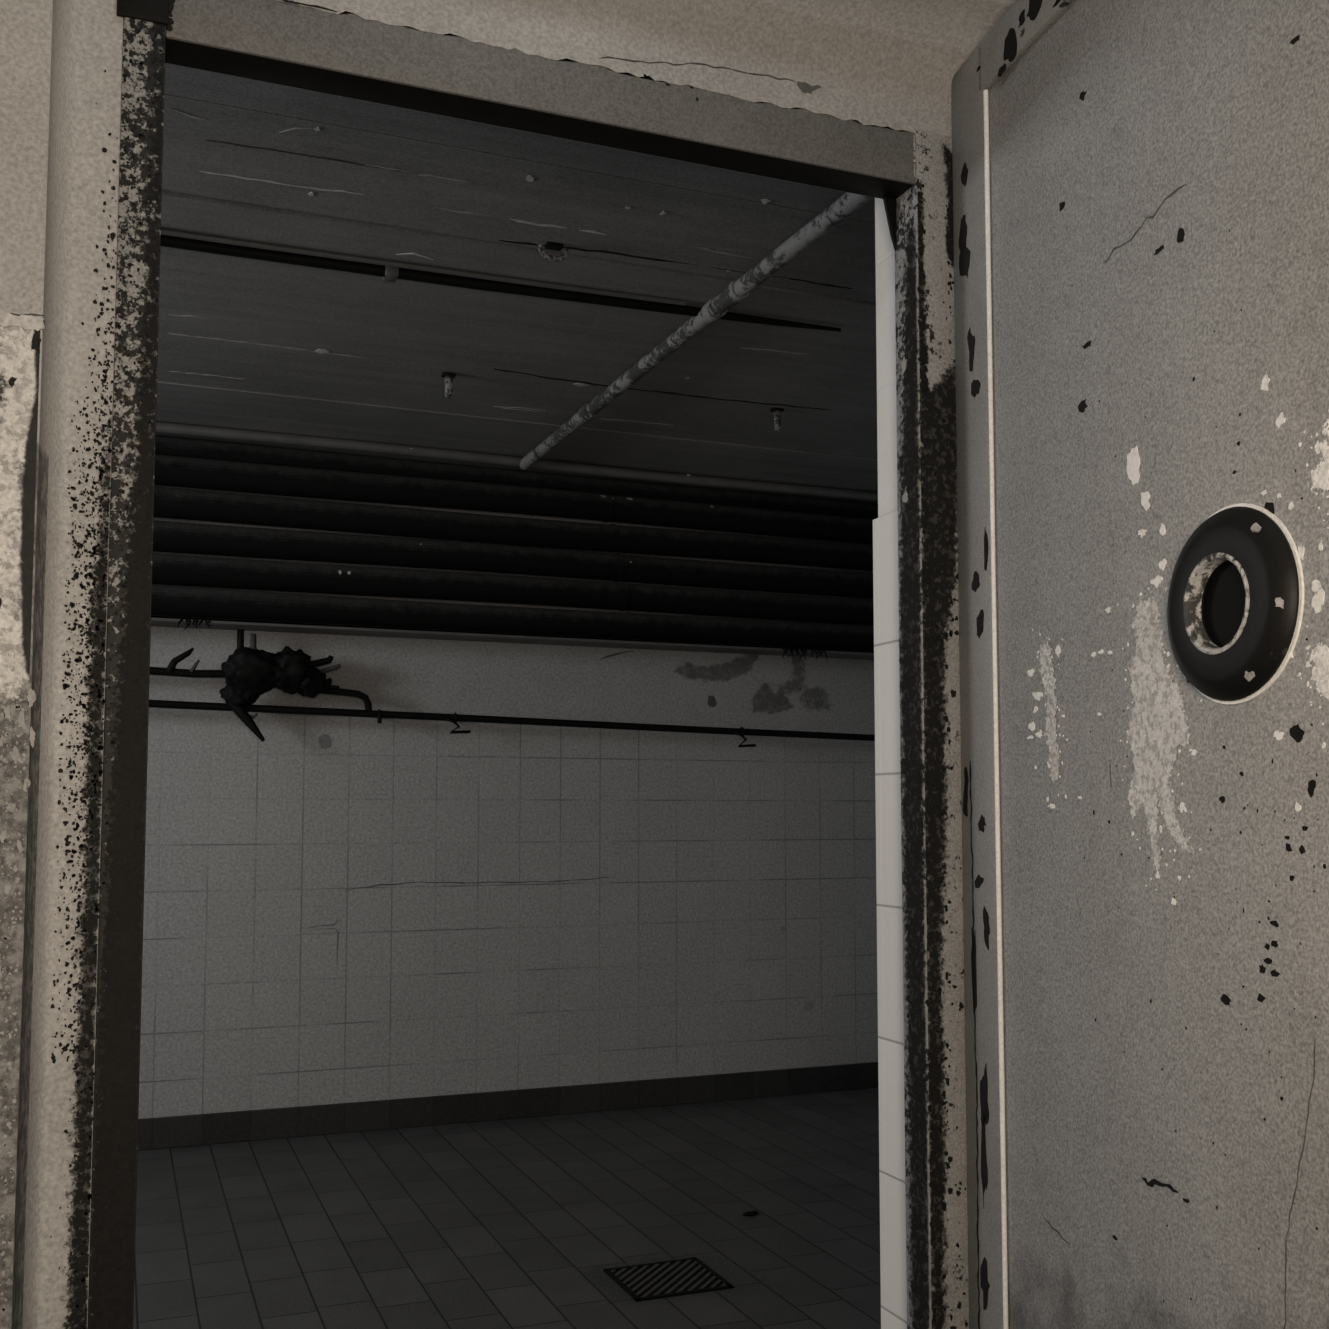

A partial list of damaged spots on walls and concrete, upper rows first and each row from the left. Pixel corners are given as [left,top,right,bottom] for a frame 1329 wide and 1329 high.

spalling [1154,228,1185,255]
water stain [0,373,12,422]
peeling [1115,446,1150,511]
peeling [1138,523,1166,538]
peeling [1261,410,1329,560]
rust [50,22,165,1329]
rust [898,145,968,1329]
peeling [1027,629,1082,809]
peeling [1091,559,1202,891]
peeling [1273,580,1329,742]
spalling [1274,773,1319,854]
spalling [1258,875,1294,977]